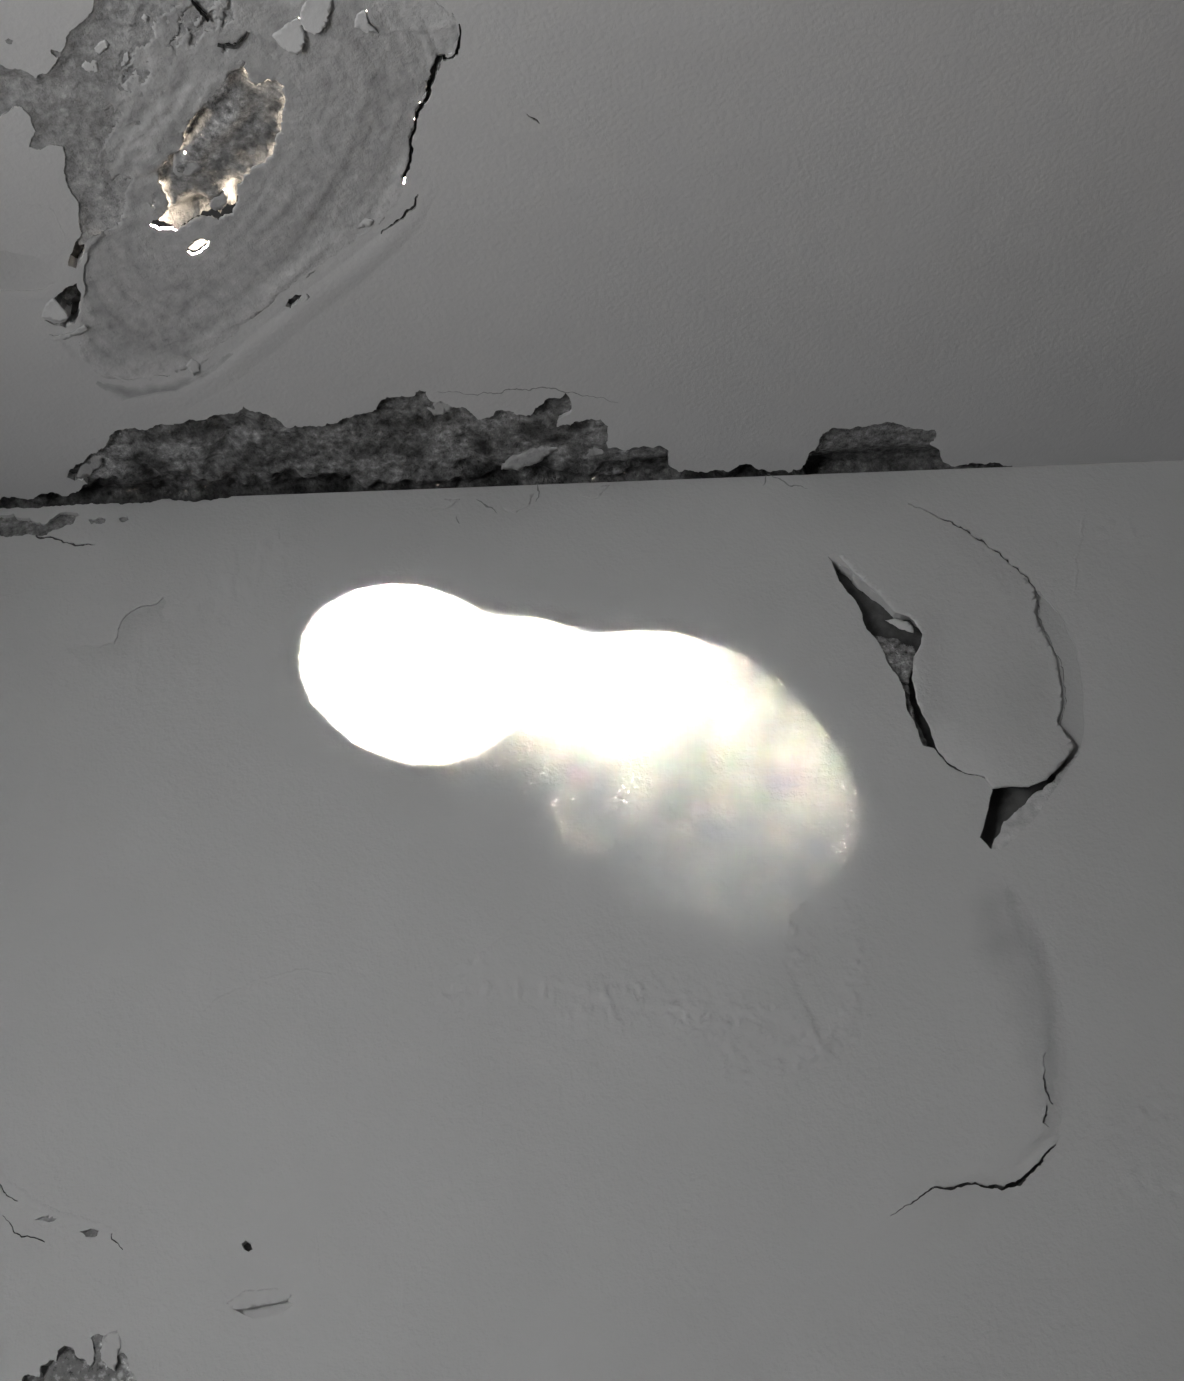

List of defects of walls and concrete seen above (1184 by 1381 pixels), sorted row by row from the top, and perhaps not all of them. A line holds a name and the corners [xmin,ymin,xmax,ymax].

peeling [0,0,461,382]
flaking render [0,390,1013,538]
flaking render [835,506,1085,850]
crack [892,1054,1054,1215]
flaking render [24,1330,137,1381]